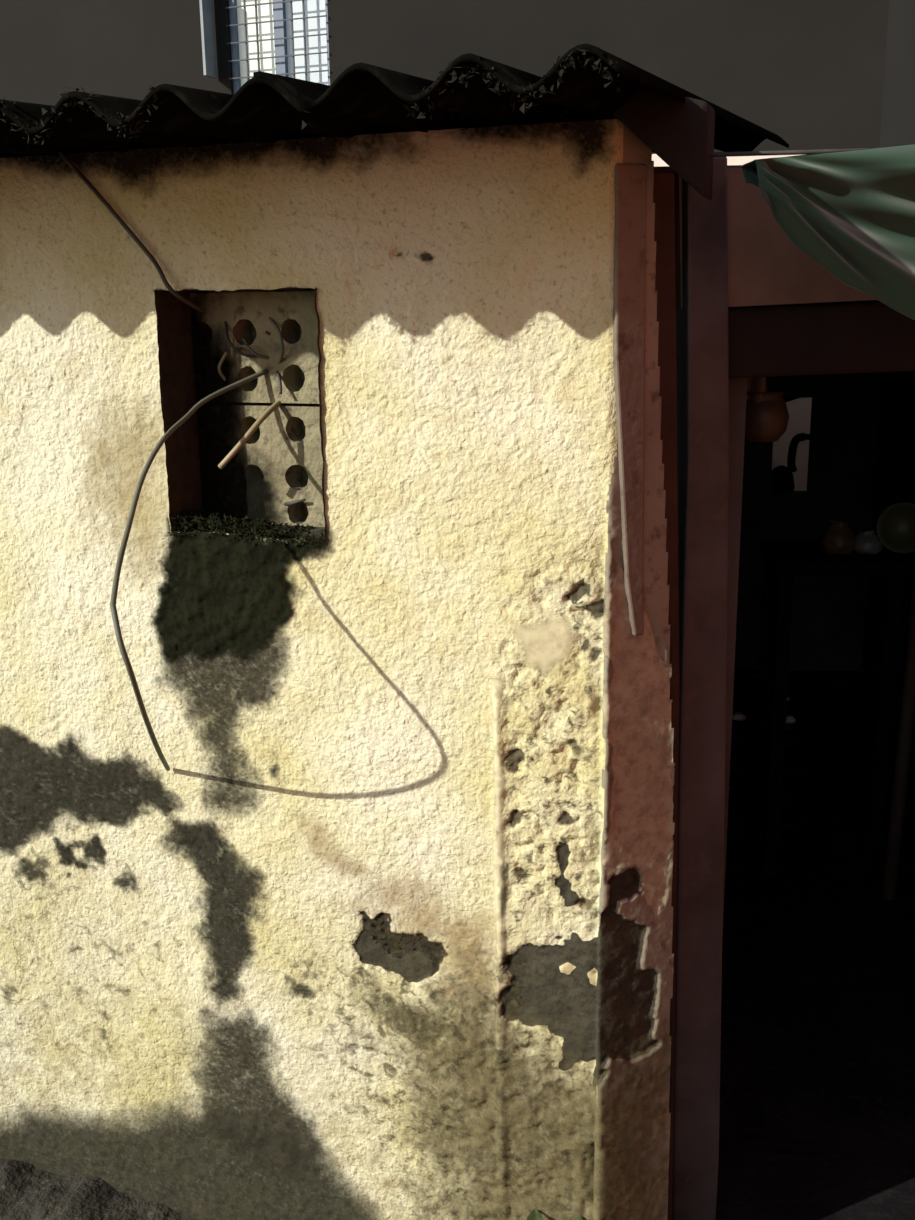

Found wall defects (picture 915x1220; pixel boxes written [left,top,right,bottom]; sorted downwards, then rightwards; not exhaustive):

flaking render [351,911,448,982]
flaking render [499,562,675,1086]